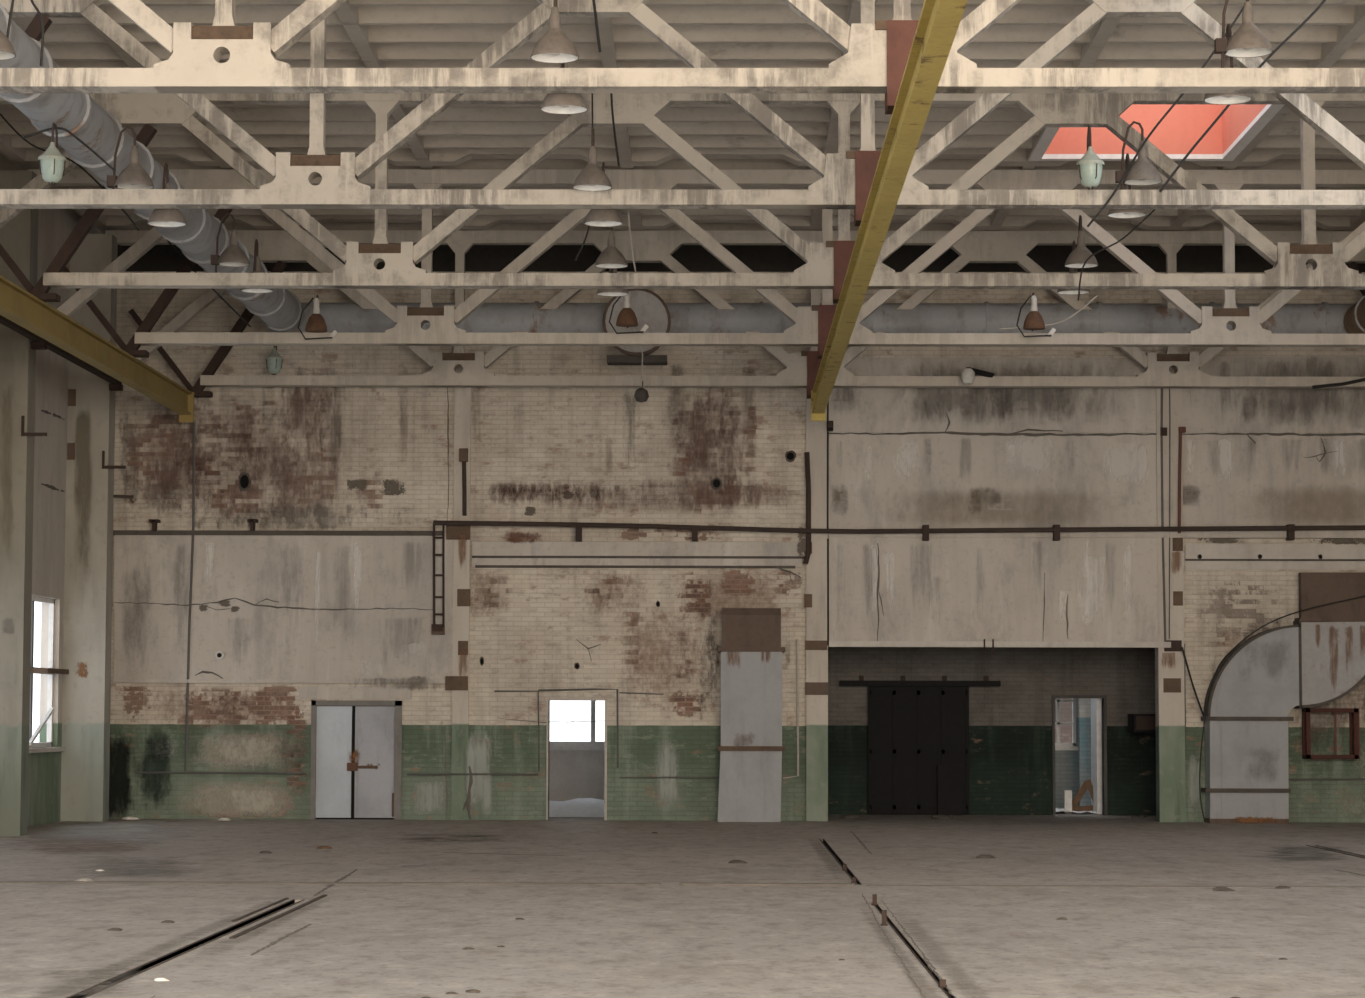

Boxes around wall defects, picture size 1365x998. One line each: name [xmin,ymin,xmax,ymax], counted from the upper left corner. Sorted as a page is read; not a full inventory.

peeling [128,415,260,513]
peeling [676,406,756,511]
peeling [622,525,715,541]
peeling [678,571,754,616]
rust [1316,625,1365,684]
peeling [124,686,150,714]
peeling [670,660,702,717]
water stain [109,736,170,818]
peeling [189,687,306,820]